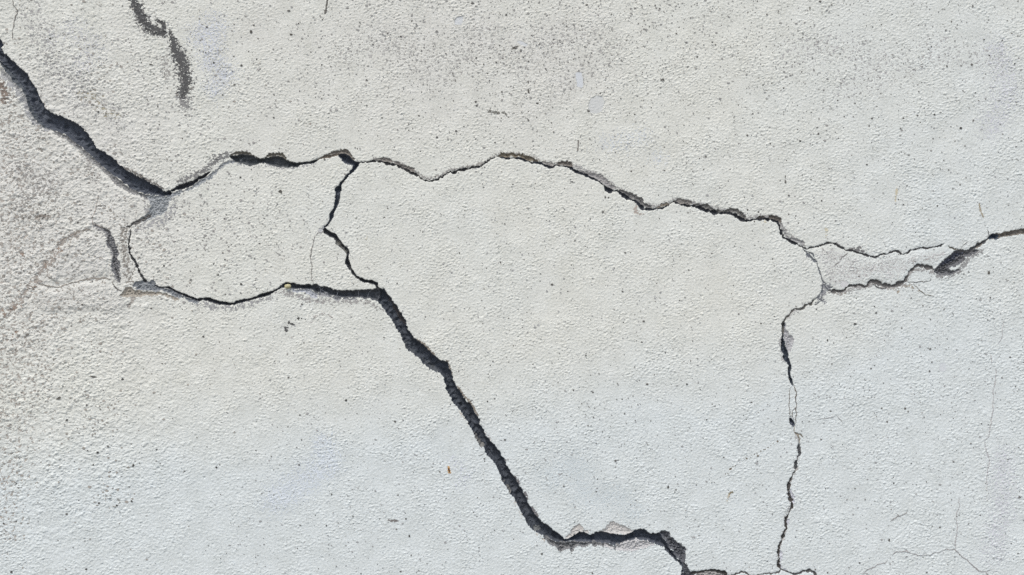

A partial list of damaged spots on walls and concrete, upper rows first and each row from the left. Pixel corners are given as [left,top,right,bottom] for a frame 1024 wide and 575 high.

crack [0,0,210,197]
crack [40,153,1024,575]